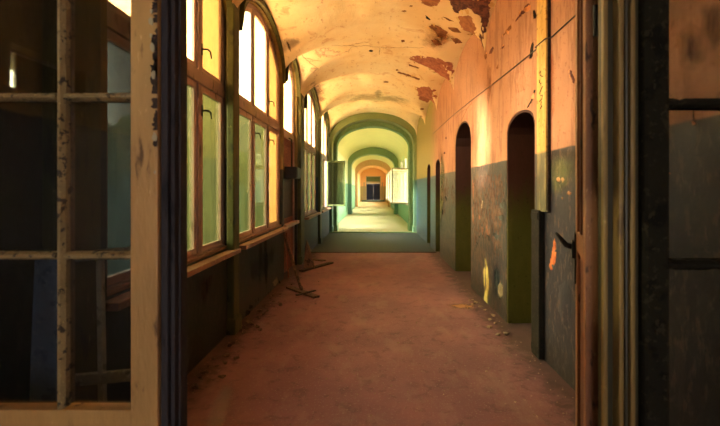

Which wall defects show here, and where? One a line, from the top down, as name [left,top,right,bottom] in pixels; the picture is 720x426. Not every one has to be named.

spalling [420,0,440,8]
spalling [425,0,537,59]
spalling [396,55,455,118]